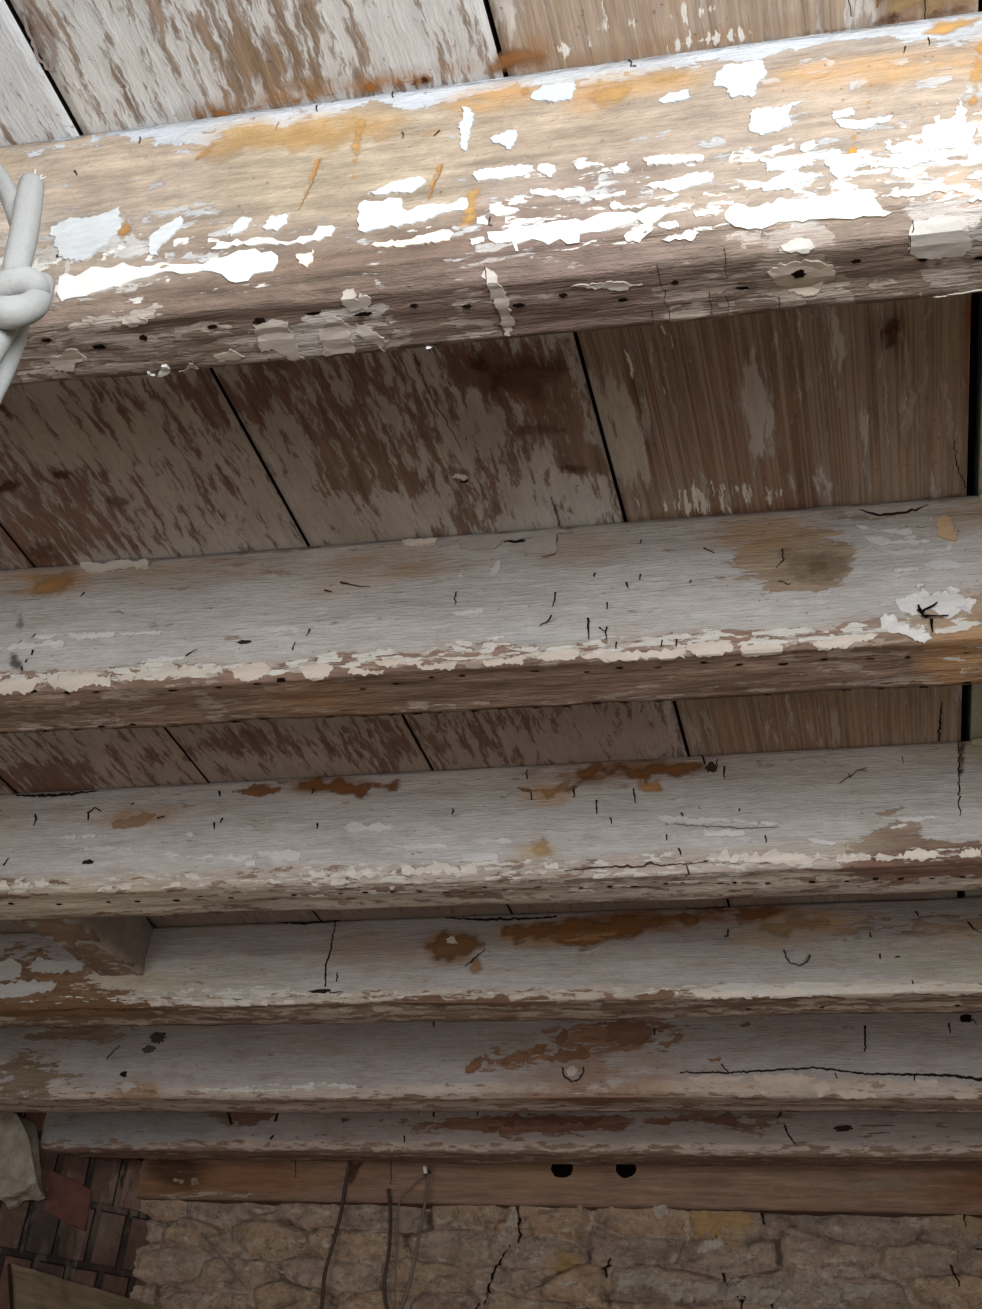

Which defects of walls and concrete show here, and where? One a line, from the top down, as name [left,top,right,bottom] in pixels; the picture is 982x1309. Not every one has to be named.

peeling [713,60,803,136]
peeling [357,98,982,297]
peeling [49,207,335,302]
spalling [813,516,976,651]
peeling [0,656,271,695]
peeling [483,640,783,667]
crack [277,920,340,987]
crack [445,914,557,922]
crack [686,906,731,938]
crack [680,1025,982,1082]
crack [776,1112,797,1145]
crack [475,1206,523,1309]